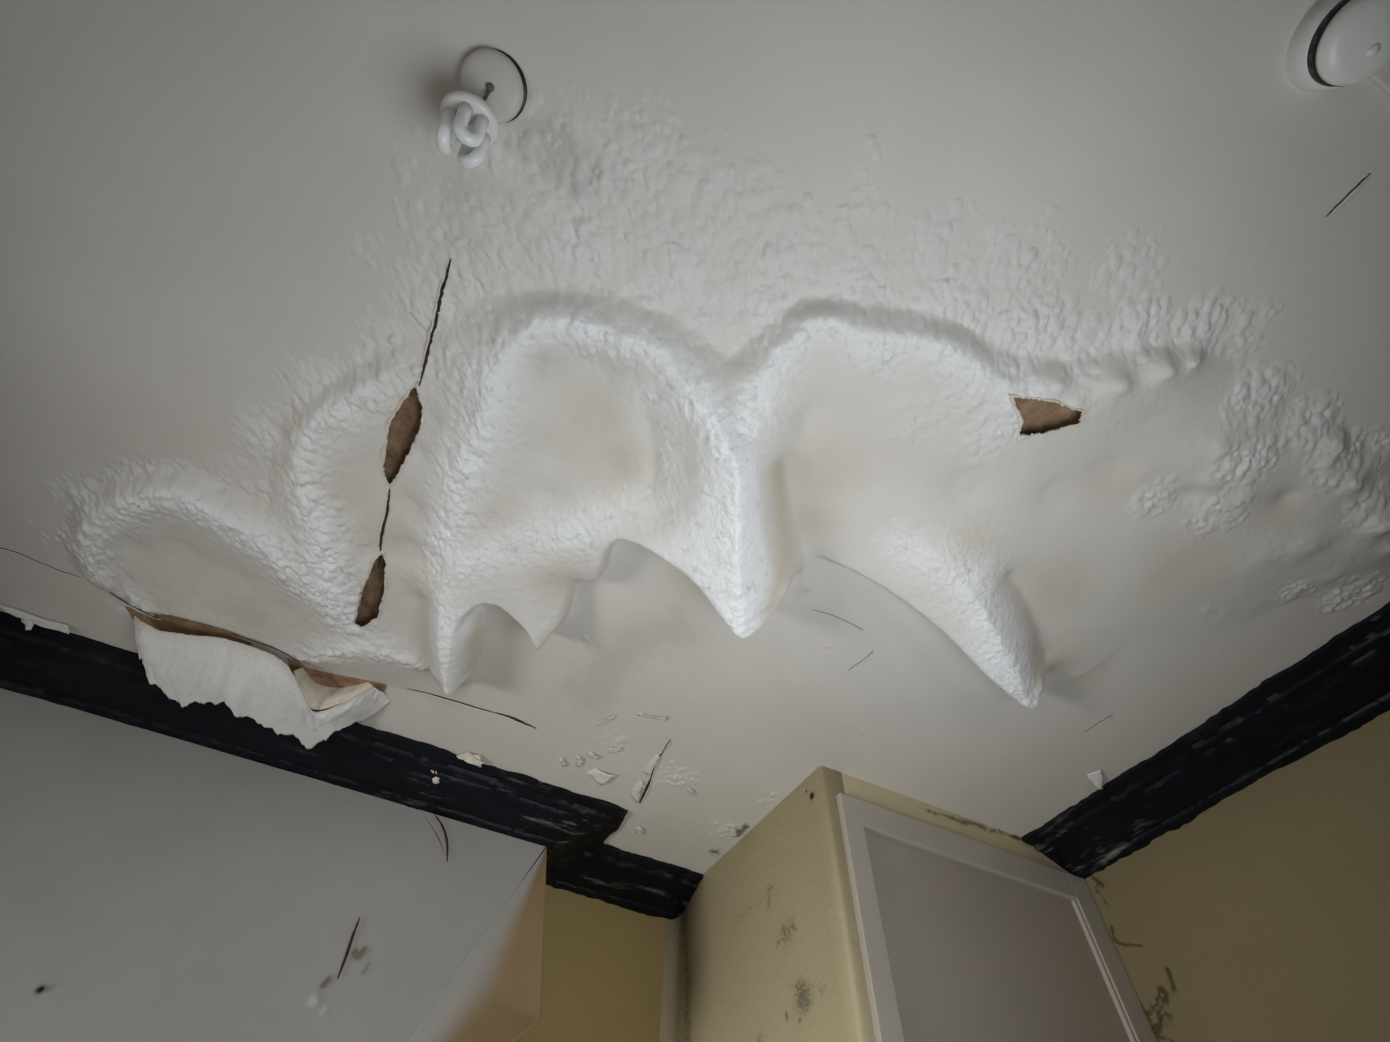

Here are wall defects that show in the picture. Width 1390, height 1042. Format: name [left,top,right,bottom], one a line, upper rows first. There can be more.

crack [418,258,451,386]
crack [378,488,390,557]
peeling [134,616,390,749]
peeling [631,755,660,803]